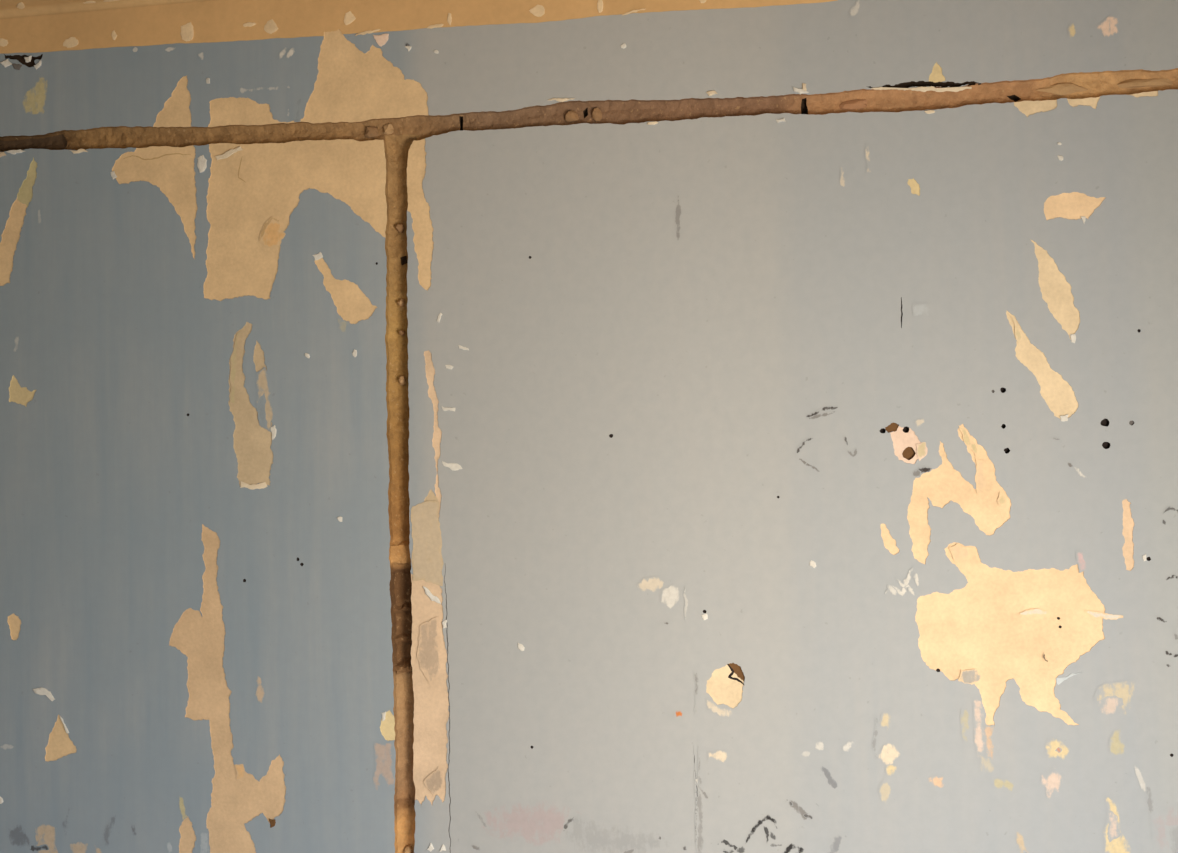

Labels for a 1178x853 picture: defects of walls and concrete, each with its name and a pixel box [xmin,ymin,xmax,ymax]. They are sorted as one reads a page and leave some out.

peeling [208,11,429,127]
peeling [111,139,387,301]
peeling [228,322,277,490]
peeling [313,252,377,333]
peeling [407,139,434,291]
peeling [1006,311,1078,422]
peeling [1030,239,1080,343]
peeling [880,417,1011,564]
peeling [165,524,286,853]
peeling [411,350,451,853]
flaking render [693,663,745,718]
peeling [915,542,1123,726]